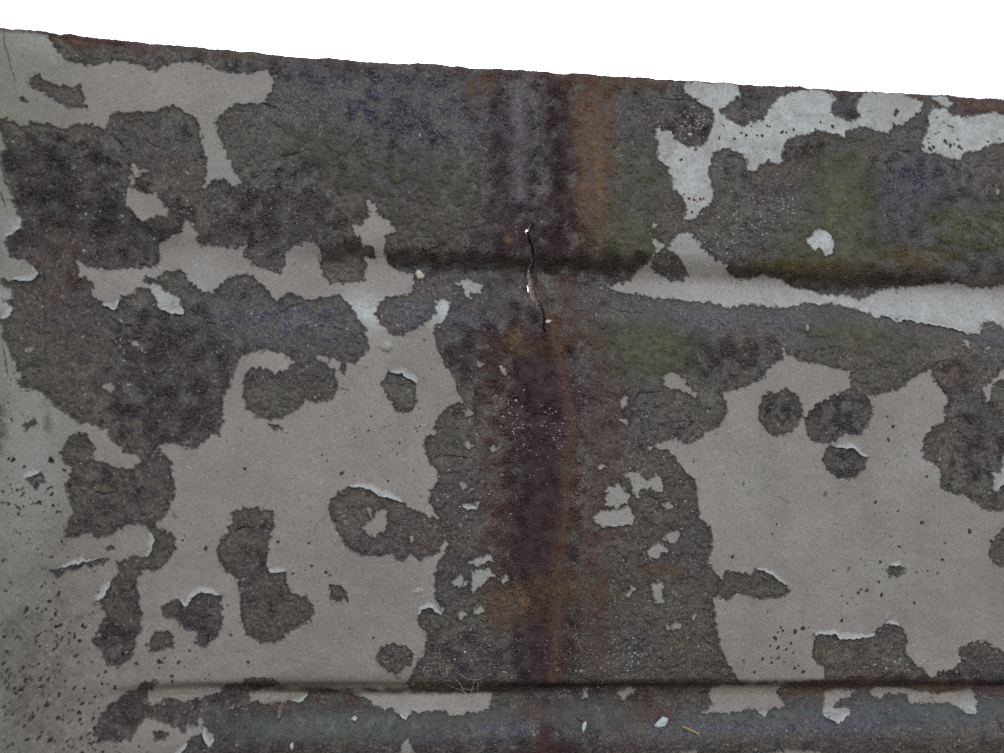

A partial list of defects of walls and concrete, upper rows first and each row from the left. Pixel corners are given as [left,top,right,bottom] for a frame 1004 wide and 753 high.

peeling [0,33,498,666]
crack [516,214,547,342]
rust [504,320,570,686]
peeling [94,259,1004,753]
rust [473,71,665,273]
peeling [489,68,1004,511]
rust [953,98,1004,112]